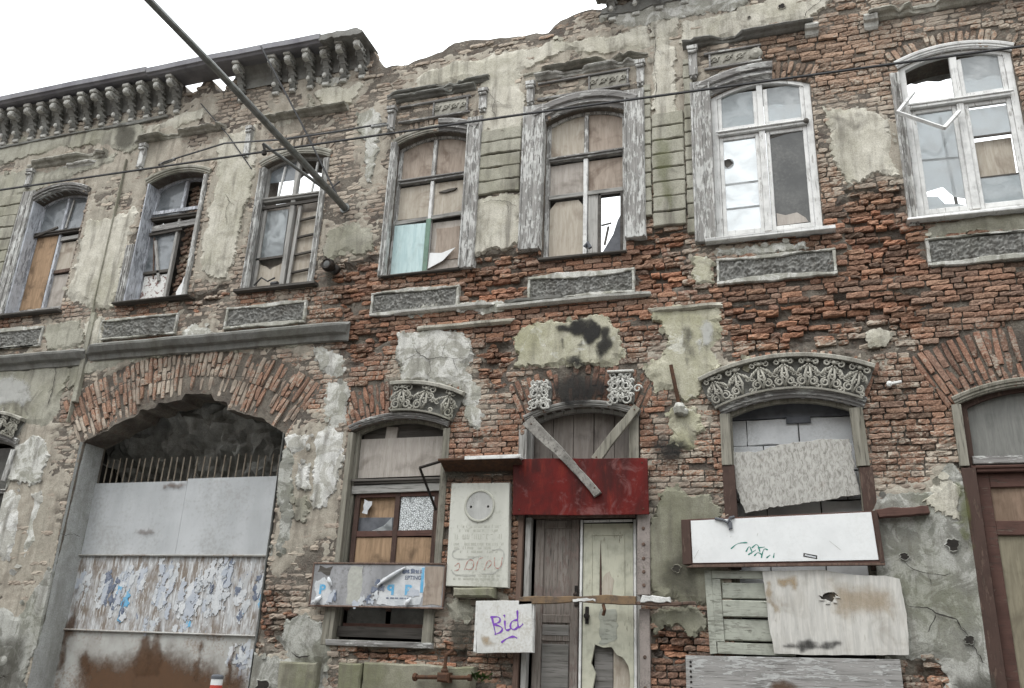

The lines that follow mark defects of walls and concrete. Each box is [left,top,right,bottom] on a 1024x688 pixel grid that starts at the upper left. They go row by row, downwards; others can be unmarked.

flaking render [416,0,832,131]
spalling [622,106,928,451]
corrosion [57,617,75,669]
flaking render [0,353,188,576]
corrosion [80,630,245,688]
flaking render [269,222,627,562]
flaking render [872,463,990,688]
crack [909,606,990,668]